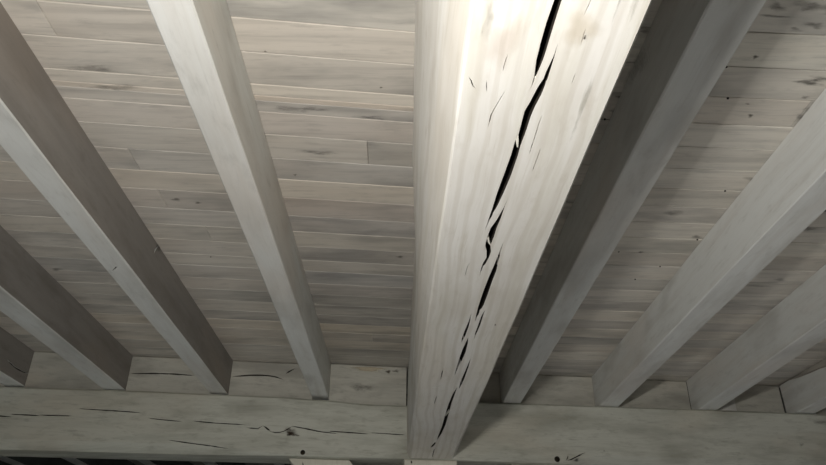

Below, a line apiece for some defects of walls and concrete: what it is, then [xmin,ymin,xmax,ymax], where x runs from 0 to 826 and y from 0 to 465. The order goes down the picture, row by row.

crack [431,0,562,457]
crack [131,370,193,378]
crack [233,369,294,379]
crack [0,411,67,419]
crack [88,409,402,449]